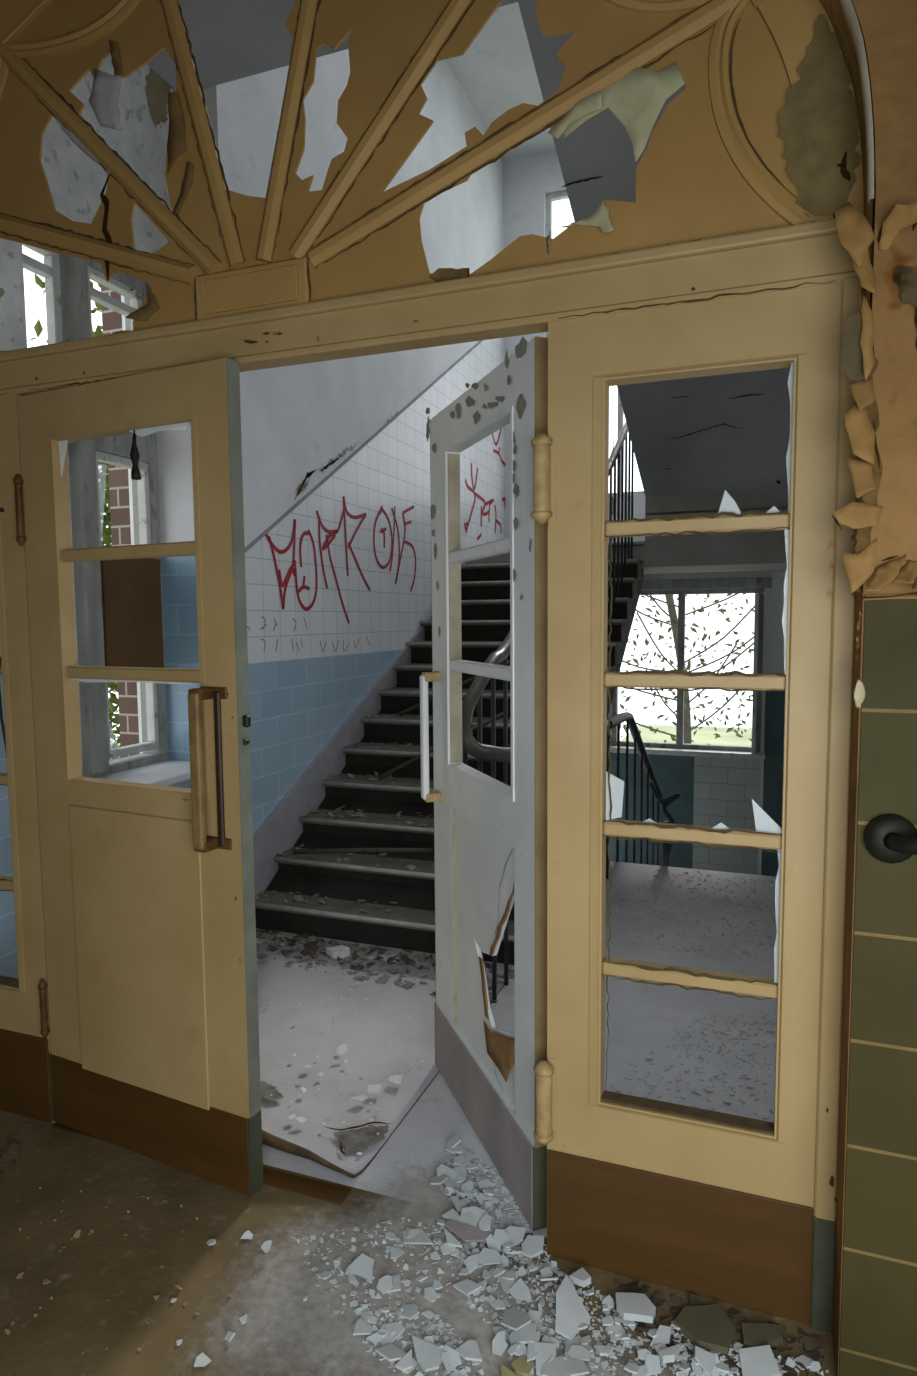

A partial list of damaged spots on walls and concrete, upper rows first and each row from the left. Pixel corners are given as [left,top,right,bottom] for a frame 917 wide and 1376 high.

spalling [778,14,917,601]
peeling [425,408,436,453]
peeling [450,337,527,498]